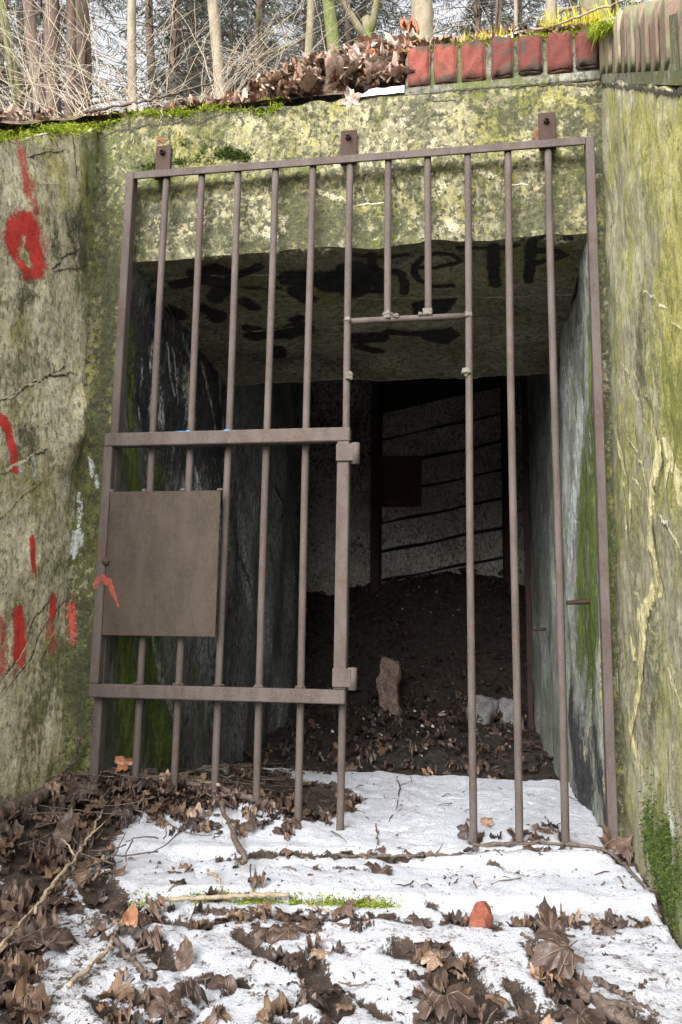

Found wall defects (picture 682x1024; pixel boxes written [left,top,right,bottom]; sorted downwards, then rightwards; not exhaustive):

water stain [595,86,606,256]
crack [51,247,87,272]
water stain [194,171,369,256]
water stain [498,205,572,243]
crack [0,366,75,402]
water stain [566,270,624,796]
water stain [115,635,168,685]
water stain [114,698,173,773]